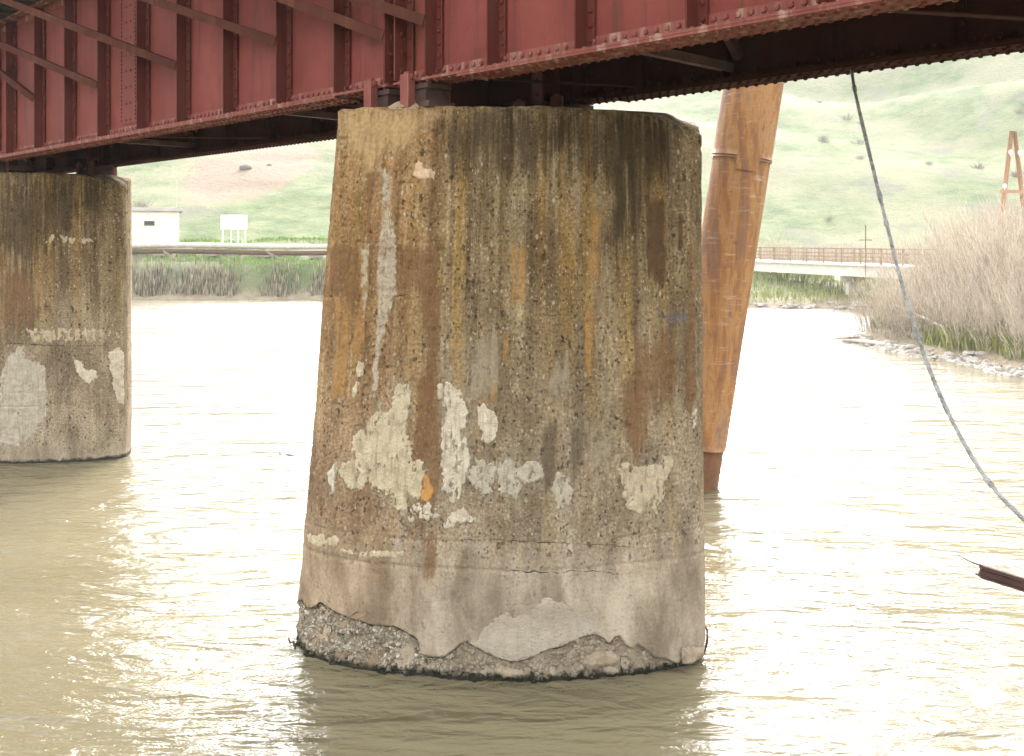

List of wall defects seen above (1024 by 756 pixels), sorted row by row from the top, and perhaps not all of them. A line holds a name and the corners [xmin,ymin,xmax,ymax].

water stain [442,112,669,237]
peeling [45,234,93,244]
corrosion [585,310,593,371]
peeling [0,327,125,447]
peeling [352,361,379,399]
peeling [327,374,574,529]
peeling [616,452,674,520]
crack [463,539,633,575]
spalling [295,597,699,683]